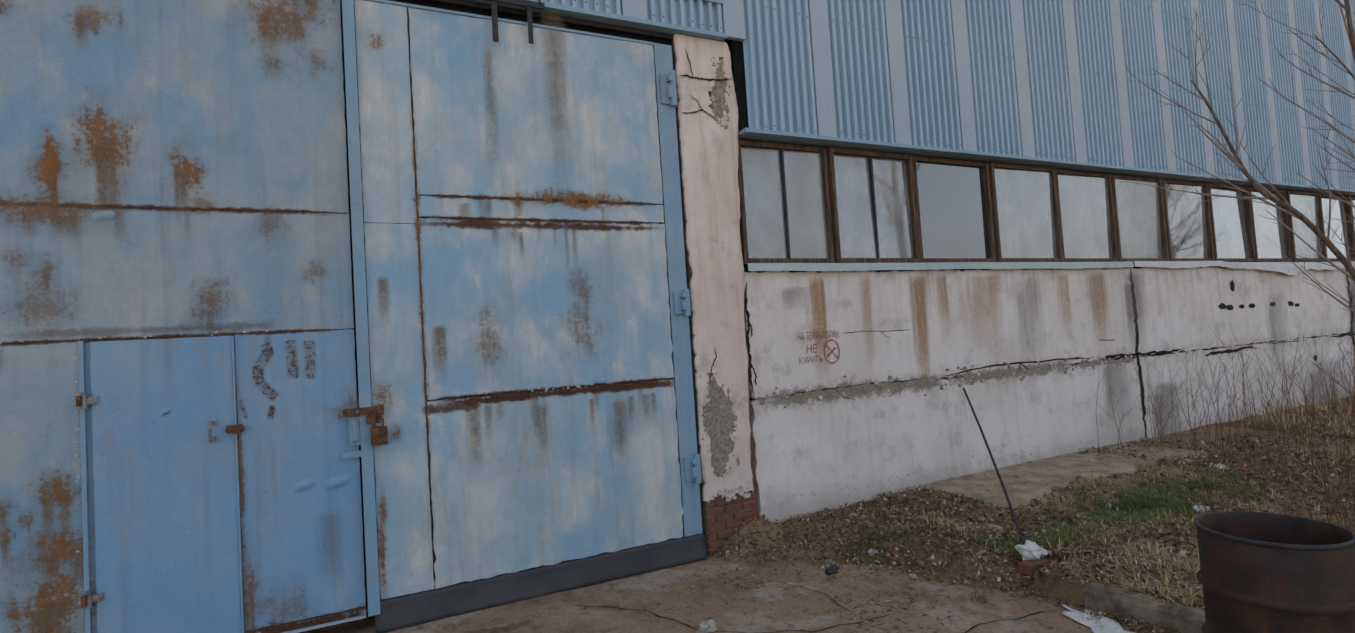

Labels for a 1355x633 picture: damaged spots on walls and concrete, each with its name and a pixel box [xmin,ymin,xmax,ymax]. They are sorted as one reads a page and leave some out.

corrosion [248,0,325,42]
spalling [711,57,730,129]
corrosion [0,105,317,227]
corrosion [413,187,672,430]
spalling [757,355,1136,410]
spalling [701,371,817,549]
corrosion [0,469,97,633]